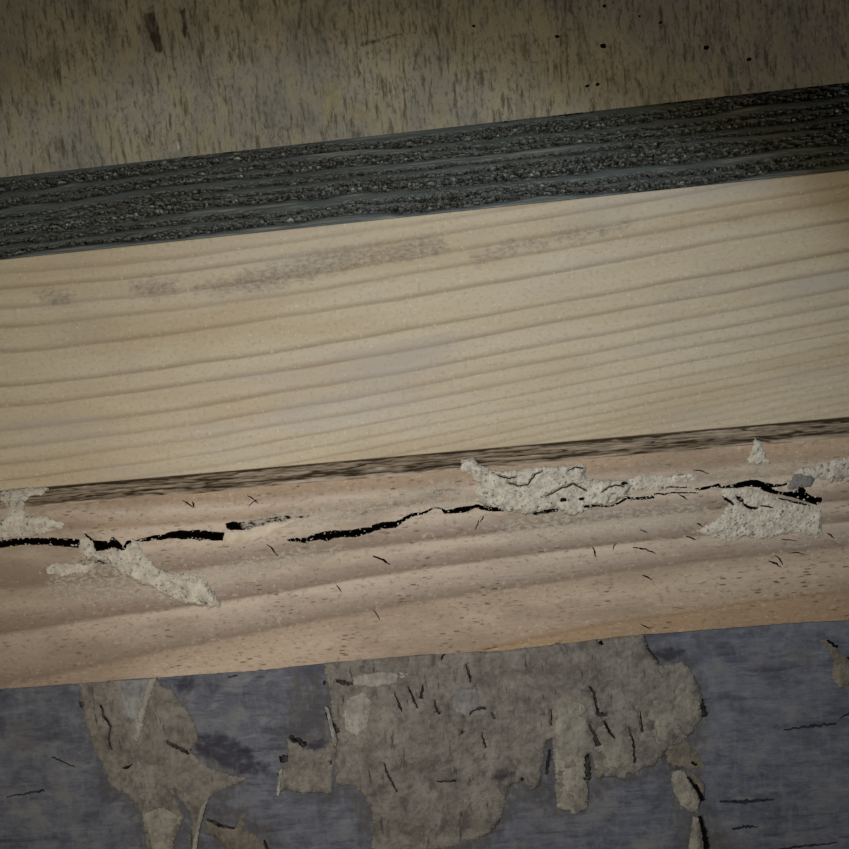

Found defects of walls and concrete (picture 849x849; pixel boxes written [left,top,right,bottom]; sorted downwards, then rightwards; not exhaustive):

crack [584,470,822,510]
crack [0,495,506,565]
crack [532,509,558,537]
crack [592,530,656,557]
crack [769,539,802,567]